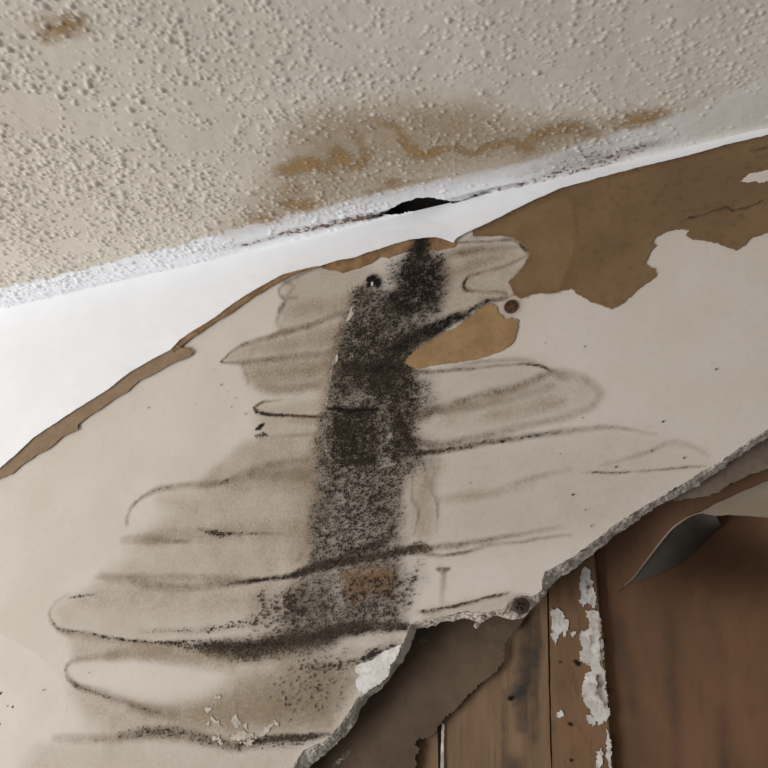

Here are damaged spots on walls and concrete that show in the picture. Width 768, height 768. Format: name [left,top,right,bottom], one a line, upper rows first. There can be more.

damp [620,111,662,126]
damp [281,113,577,184]
damp [498,143,654,191]
crack [369,188,493,219]
damp [242,213,373,246]
damp [53,238,575,723]
spalling [293,430,768,768]